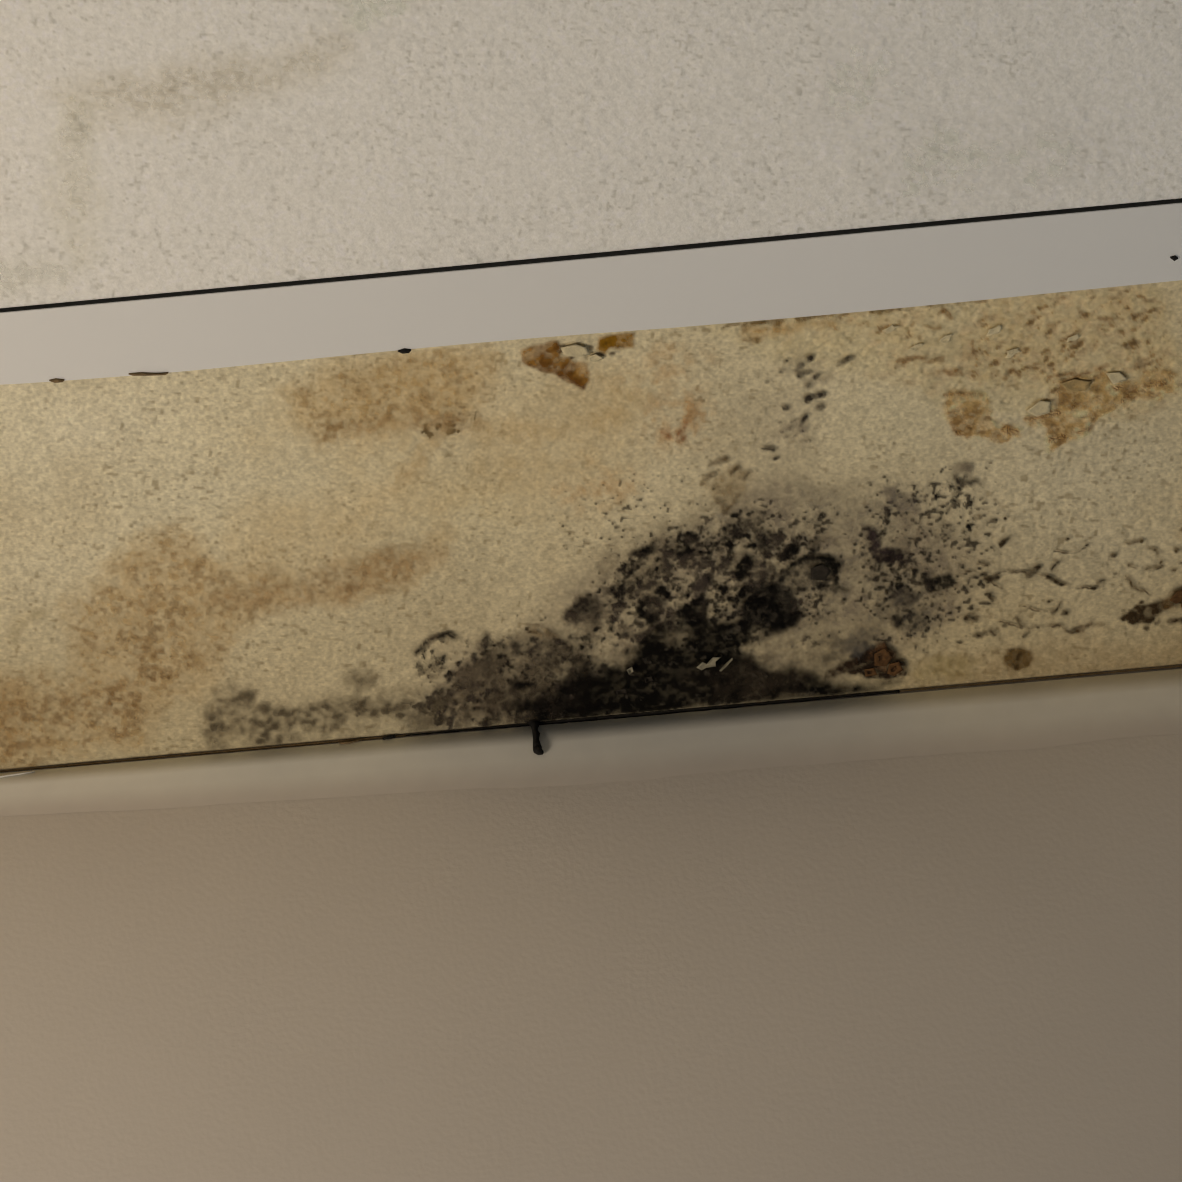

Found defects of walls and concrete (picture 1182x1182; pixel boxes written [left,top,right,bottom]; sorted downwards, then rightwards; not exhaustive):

damp [767,355,826,441]
peeling [876,290,1176,450]
damp [0,457,1182,772]